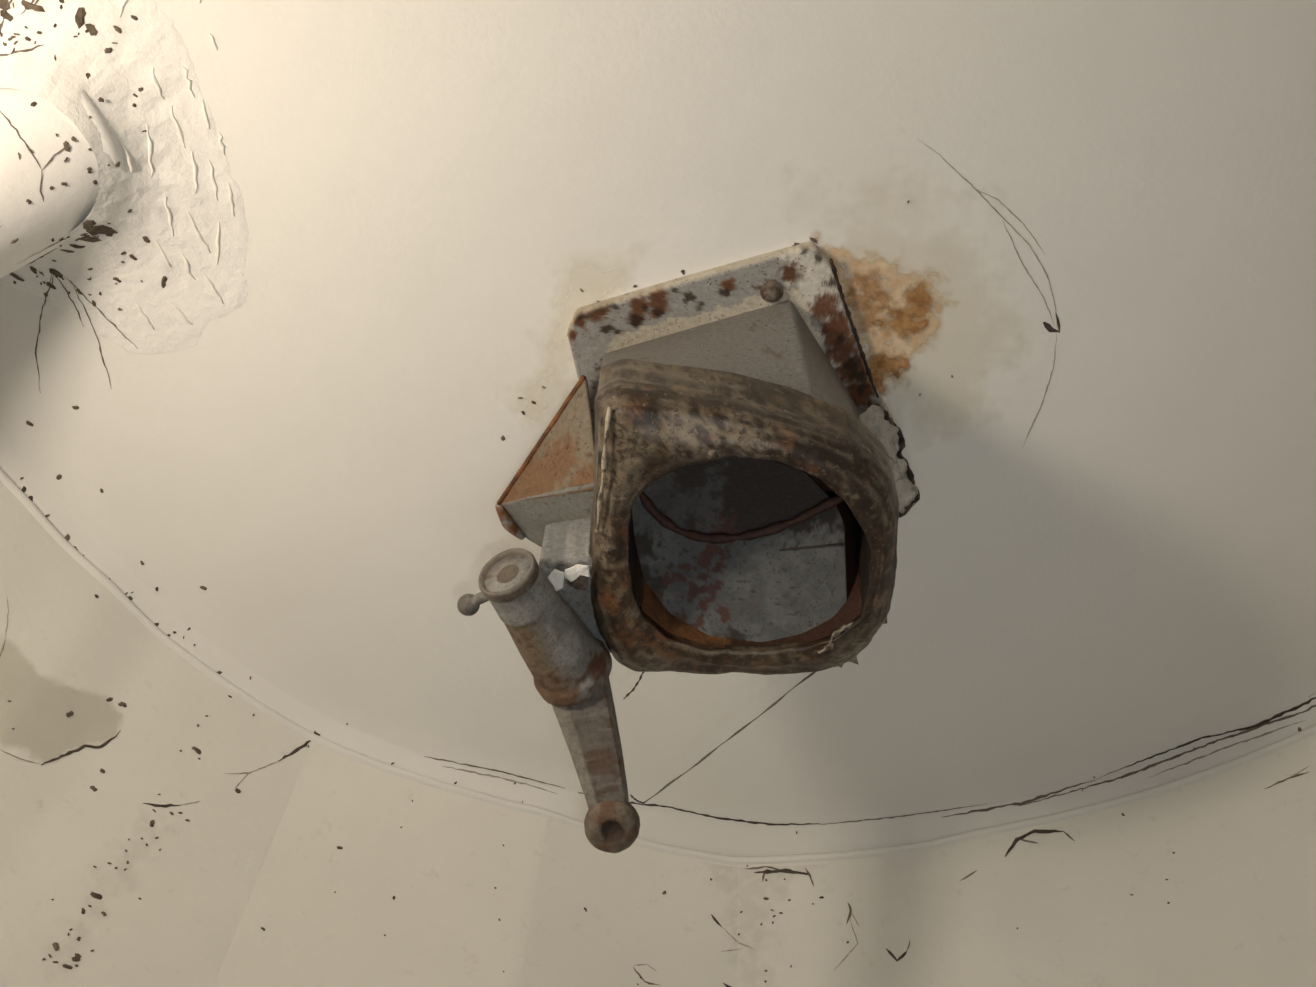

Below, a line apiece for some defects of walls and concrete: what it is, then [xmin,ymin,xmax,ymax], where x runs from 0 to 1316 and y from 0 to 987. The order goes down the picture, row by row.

corrosion [823,247,941,398]
crack [917,139,1060,446]
crack [224,740,311,788]
crack [428,757,584,794]
crack [629,692,1316,857]